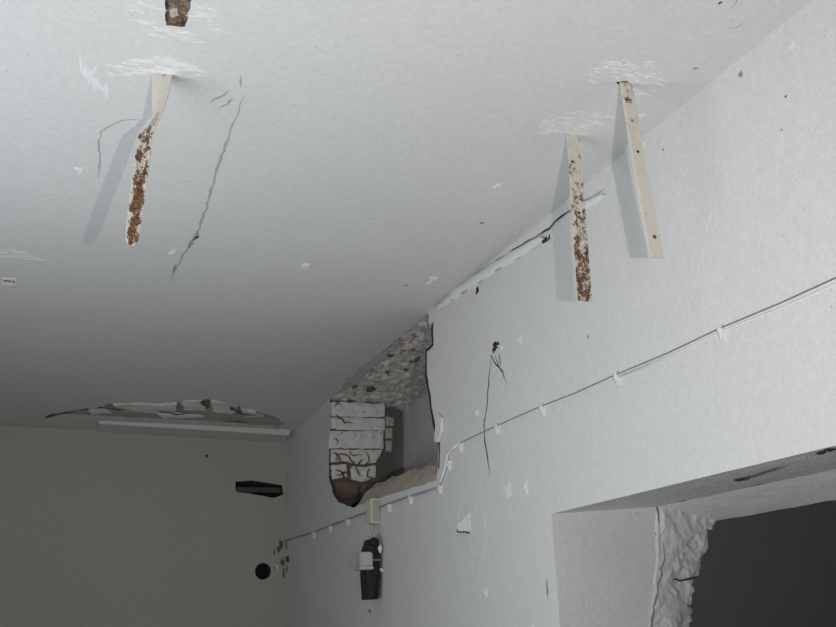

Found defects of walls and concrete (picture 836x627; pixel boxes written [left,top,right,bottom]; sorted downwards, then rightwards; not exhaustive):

corrosion [165,0,191,27]
crack [171,76,244,279]
spalling [45,399,285,429]
spalling [327,314,444,507]